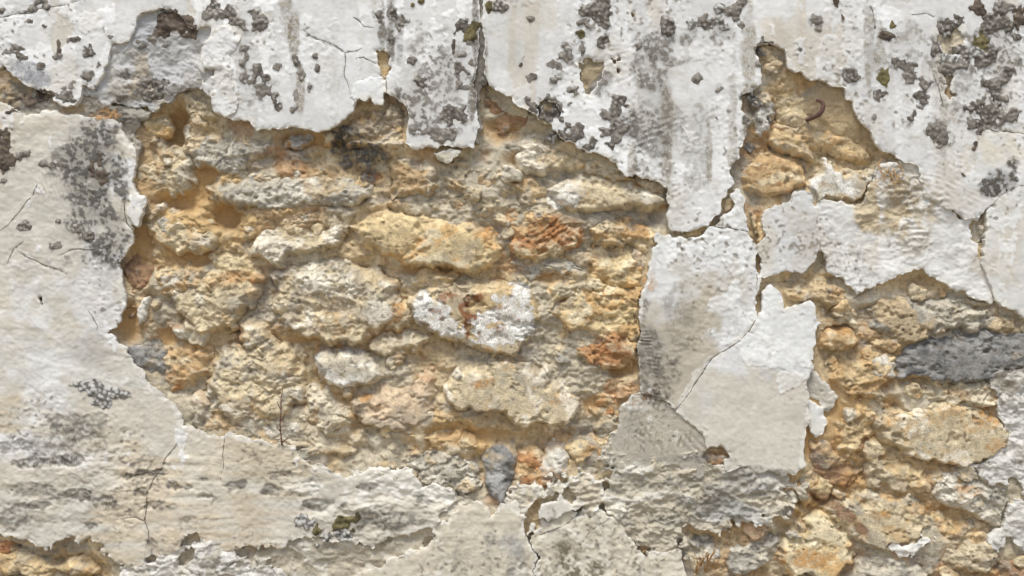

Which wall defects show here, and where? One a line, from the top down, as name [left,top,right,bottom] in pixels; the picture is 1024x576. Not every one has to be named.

crack [305,17,388,98]
spalling [109,26,682,522]
spalling [636,45,1024,576]
crack [676,318,757,410]
flaking render [12,455,81,469]
spalling [0,485,287,576]
crack [123,443,177,556]